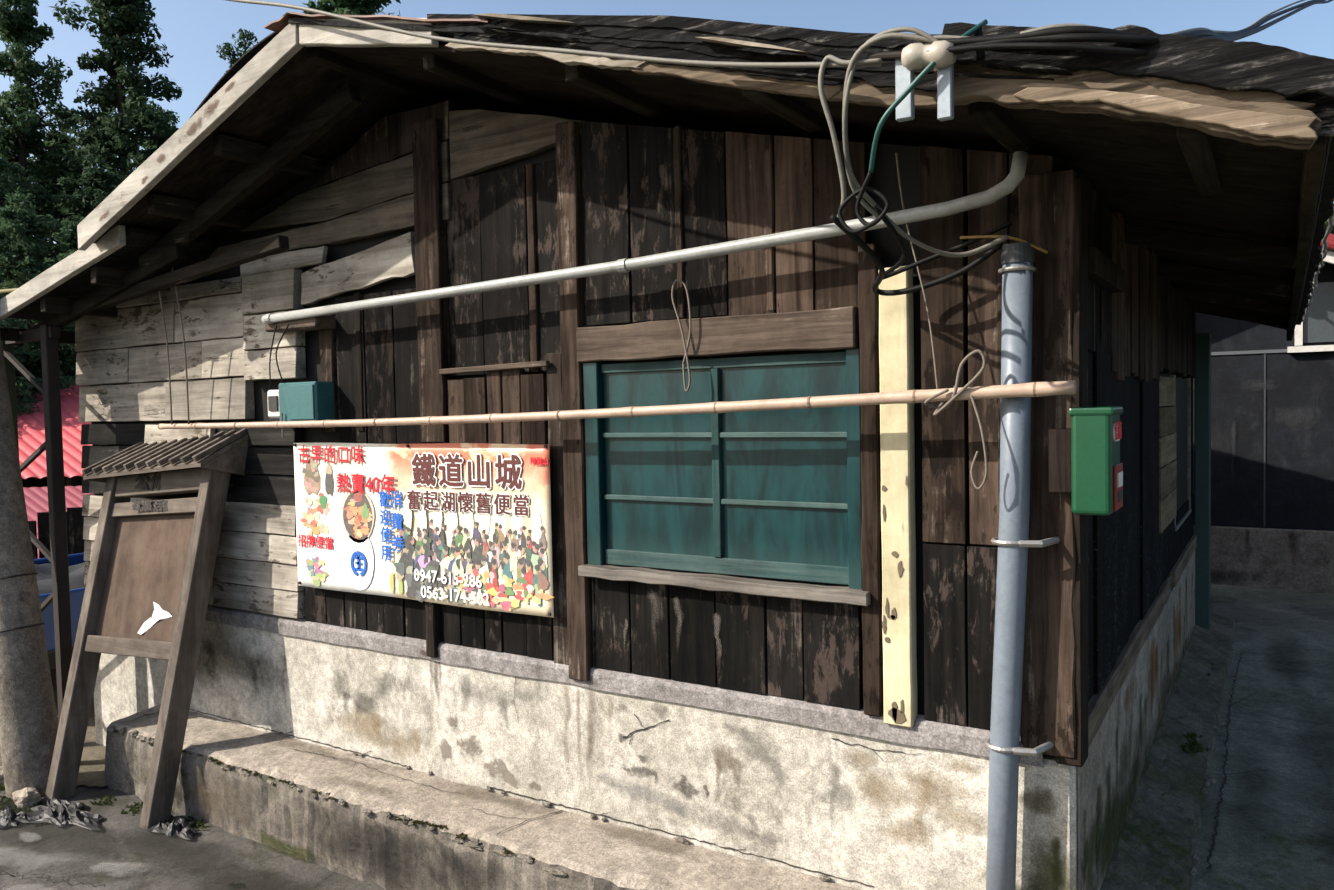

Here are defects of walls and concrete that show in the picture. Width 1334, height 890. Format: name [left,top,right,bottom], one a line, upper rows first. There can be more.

peeling [882,599,896,643]
peeling [888,700,906,724]
damp [623,756,657,783]
damp [674,751,736,798]
crack [189,709,874,887]
damp [1024,792,1051,811]